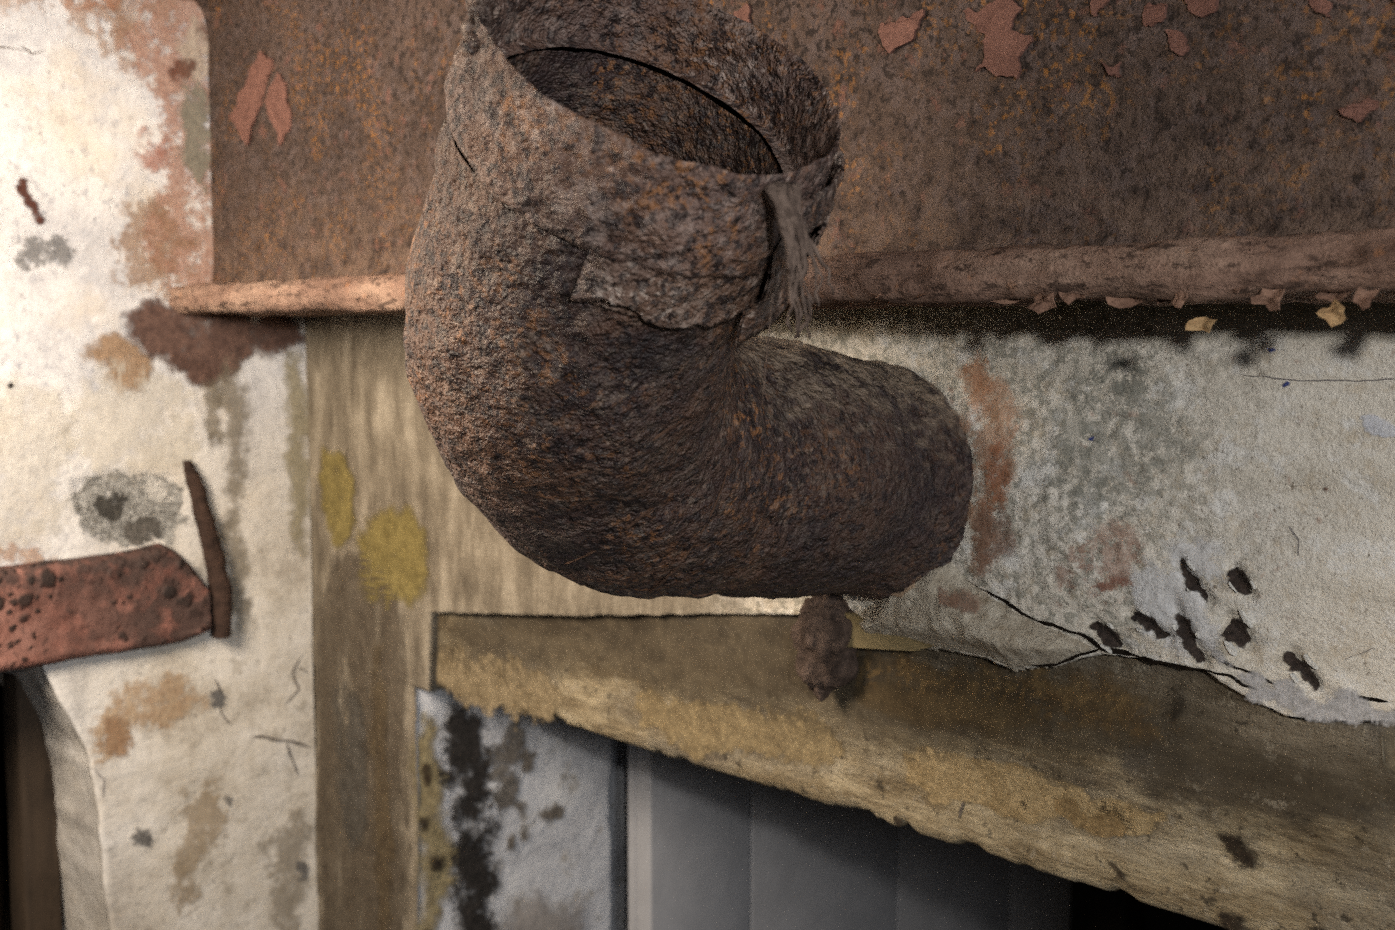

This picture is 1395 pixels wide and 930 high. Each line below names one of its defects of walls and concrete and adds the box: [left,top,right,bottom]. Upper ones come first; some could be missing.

rust [450,0,522,81]
damp [111,200,196,297]
damp [86,332,151,391]
rust [0,543,55,563]
spalling [1090,621,1123,654]
crack [969,581,1388,723]
peeling [1131,538,1395,727]
damp [436,703,582,930]